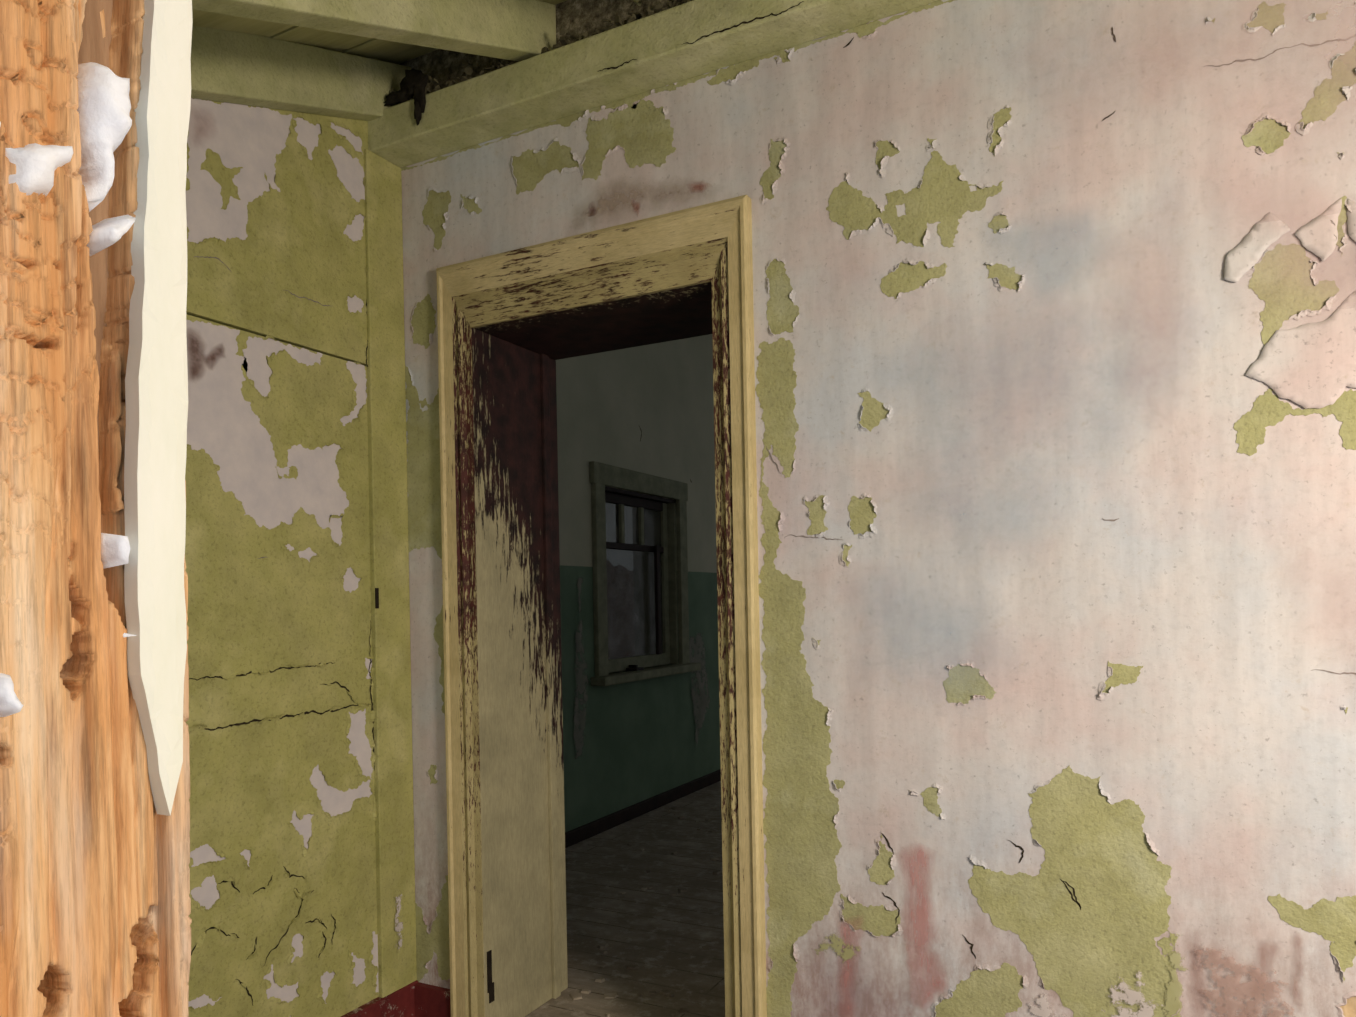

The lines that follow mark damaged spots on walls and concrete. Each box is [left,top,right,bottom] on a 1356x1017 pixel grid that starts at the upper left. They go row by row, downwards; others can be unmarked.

peeling [185,98,366,247]
peeling [401,0,955,204]
crack [683,1,804,44]
peeling [826,138,1012,299]
flaking render [1224,196,1356,456]
peeling [186,320,349,563]
peeling [405,365,442,568]
crack [188,620,377,822]
peeling [287,708,373,857]
peeling [755,257,903,1017]
peeling [931,765,1188,1017]
peeling [1268,893,1356,1017]